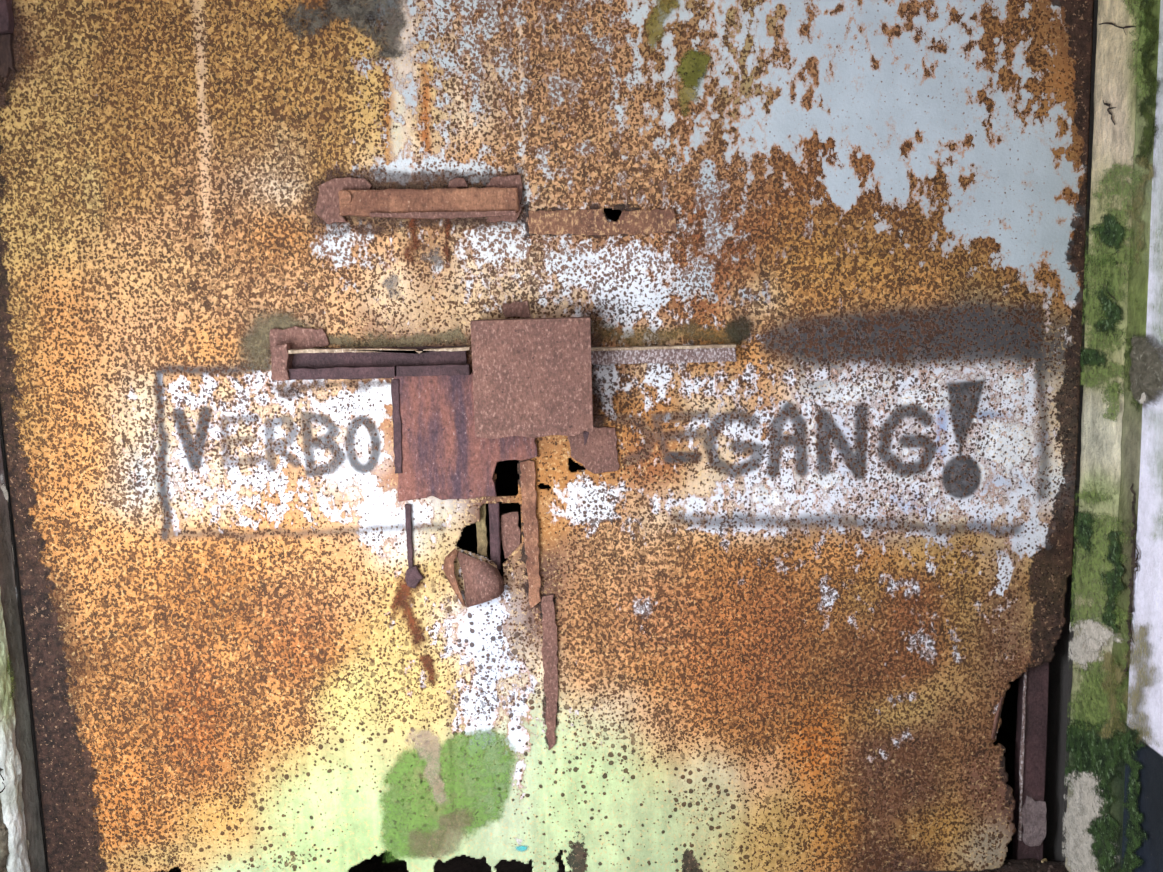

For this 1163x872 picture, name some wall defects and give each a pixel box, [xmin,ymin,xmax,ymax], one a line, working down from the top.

corrosion [403,218,420,262]
corrosion [390,581,435,685]
water stain [1068,619,1121,670]
water stain [1062,770,1108,872]